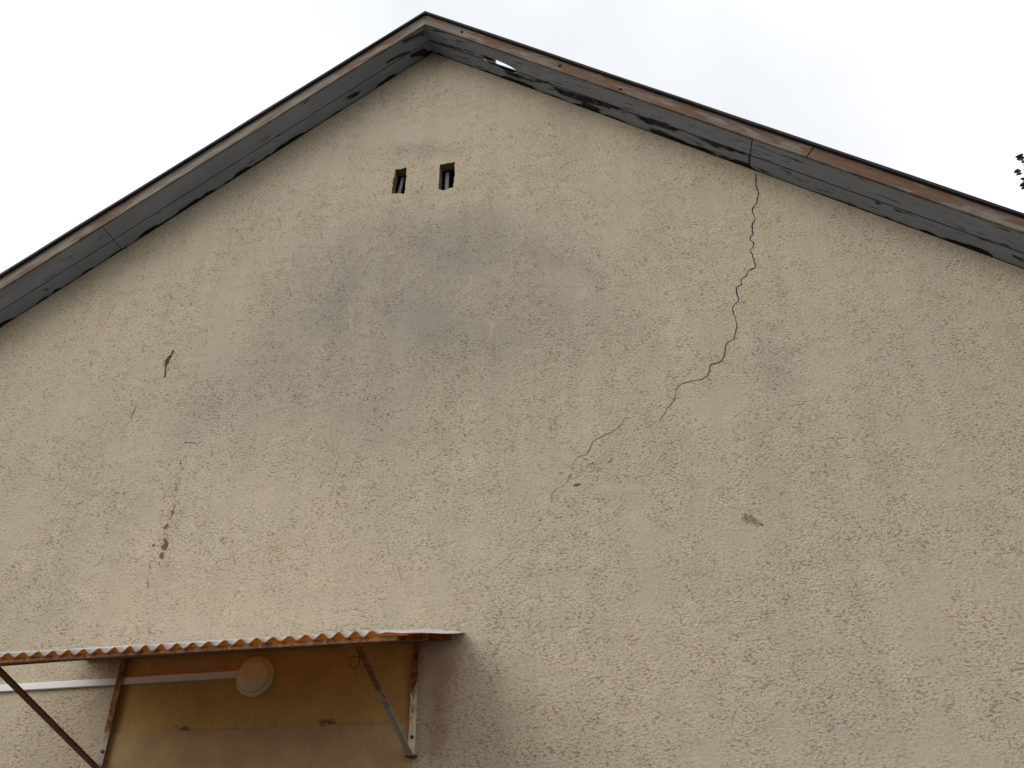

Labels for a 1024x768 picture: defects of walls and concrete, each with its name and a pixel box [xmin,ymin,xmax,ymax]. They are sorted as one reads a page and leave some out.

peeling [0,31,1024,328]
crack [660,173,760,420]